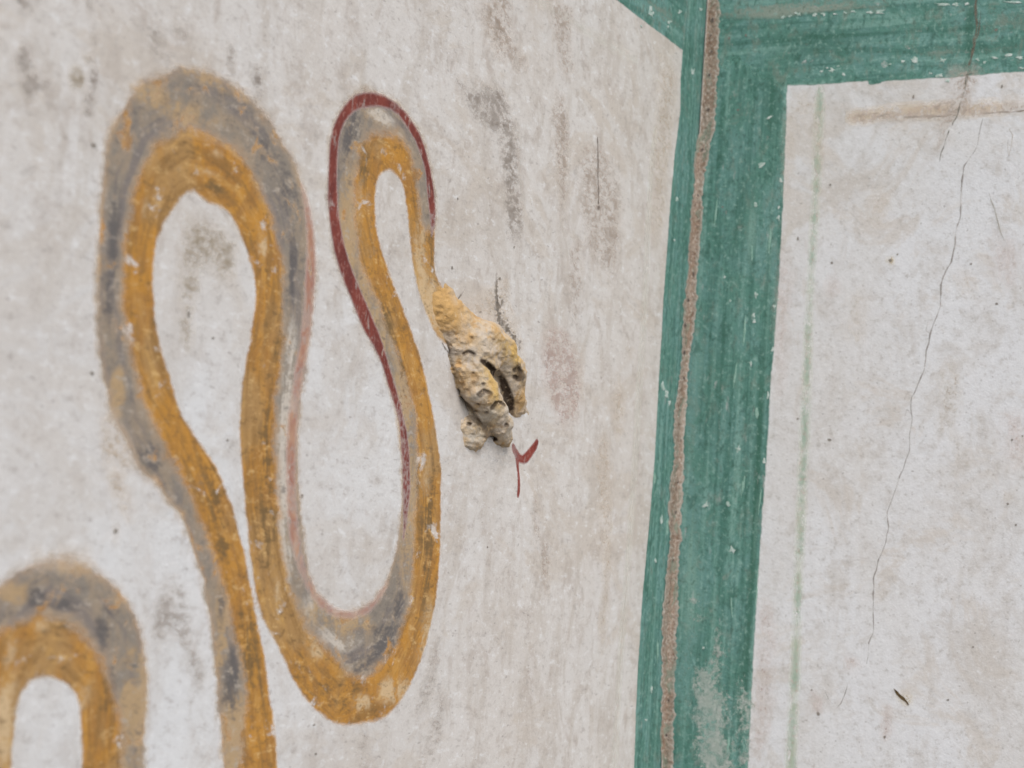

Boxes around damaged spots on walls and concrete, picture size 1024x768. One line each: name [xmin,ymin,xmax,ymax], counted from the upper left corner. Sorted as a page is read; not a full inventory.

crack [867,0,983,660]